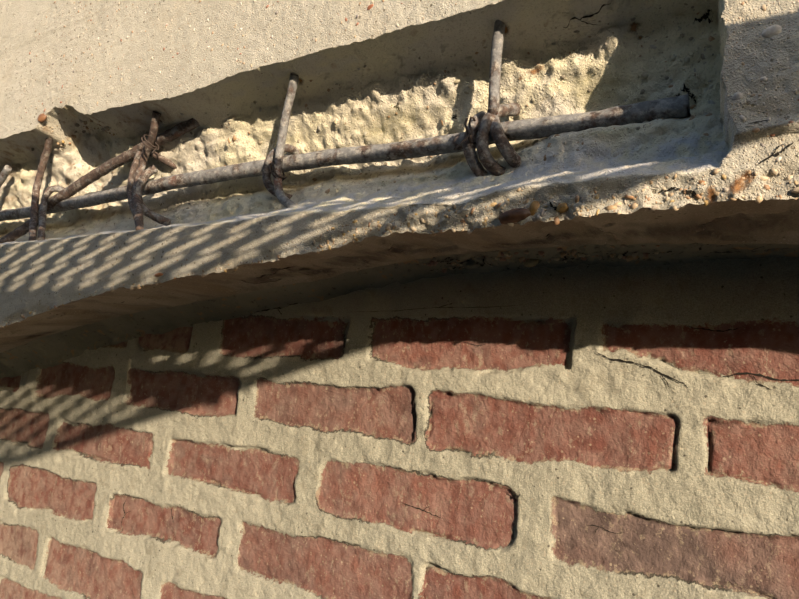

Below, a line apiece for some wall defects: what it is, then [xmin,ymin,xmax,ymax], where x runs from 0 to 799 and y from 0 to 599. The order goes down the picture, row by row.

crack [564,3,611,28]
spalling [0,0,799,253]
crack [757,143,793,165]
corrosion [731,171,753,192]
crack [592,349,688,388]
crack [723,372,799,390]